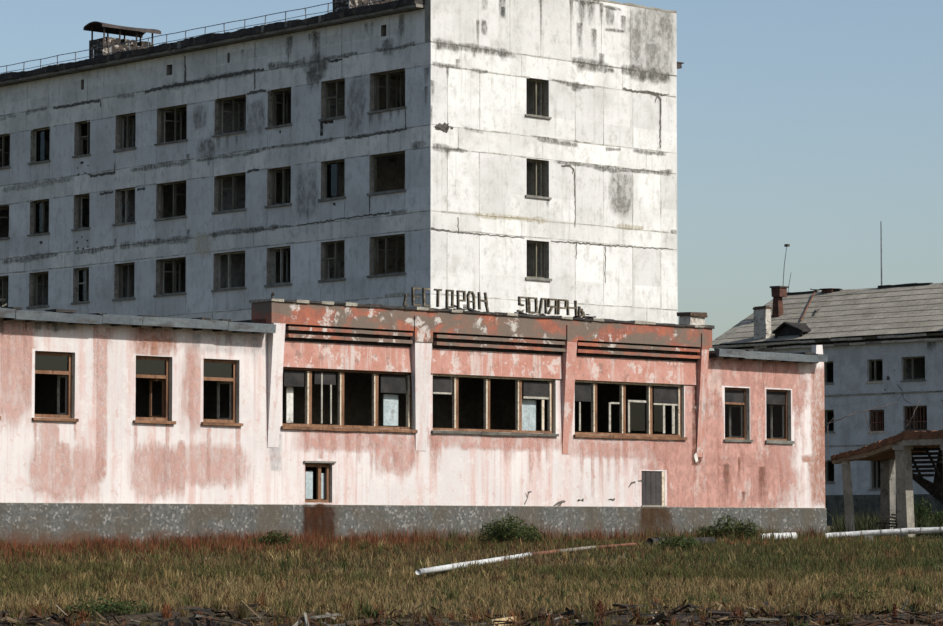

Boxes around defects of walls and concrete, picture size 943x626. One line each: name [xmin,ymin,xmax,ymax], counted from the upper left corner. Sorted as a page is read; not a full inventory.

leakage [570,0,655,52]
leakage [269,32,357,82]
leakage [573,56,669,82]